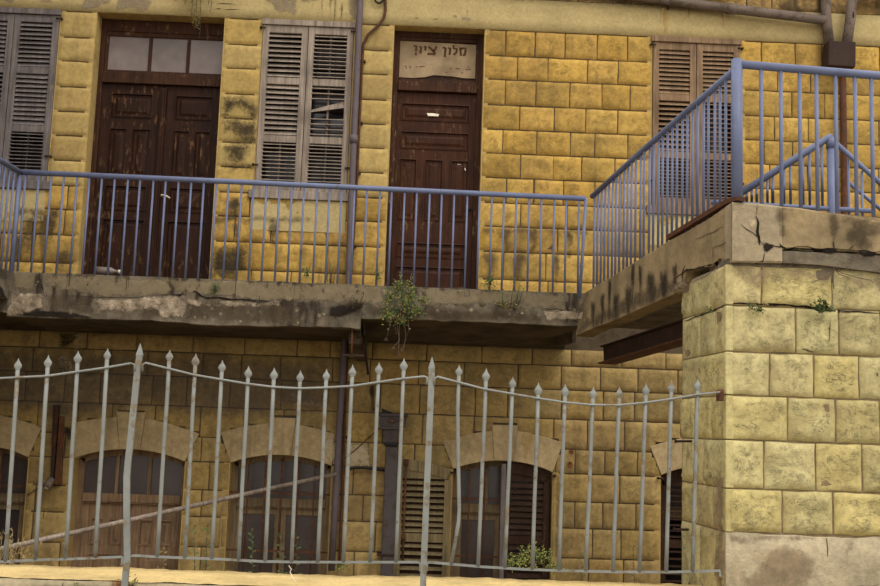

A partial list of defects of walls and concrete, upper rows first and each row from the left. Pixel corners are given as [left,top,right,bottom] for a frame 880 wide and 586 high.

crack [675,212,880,282]
peeling [0,271,383,319]
peeling [417,288,583,321]
damp [748,549,811,586]